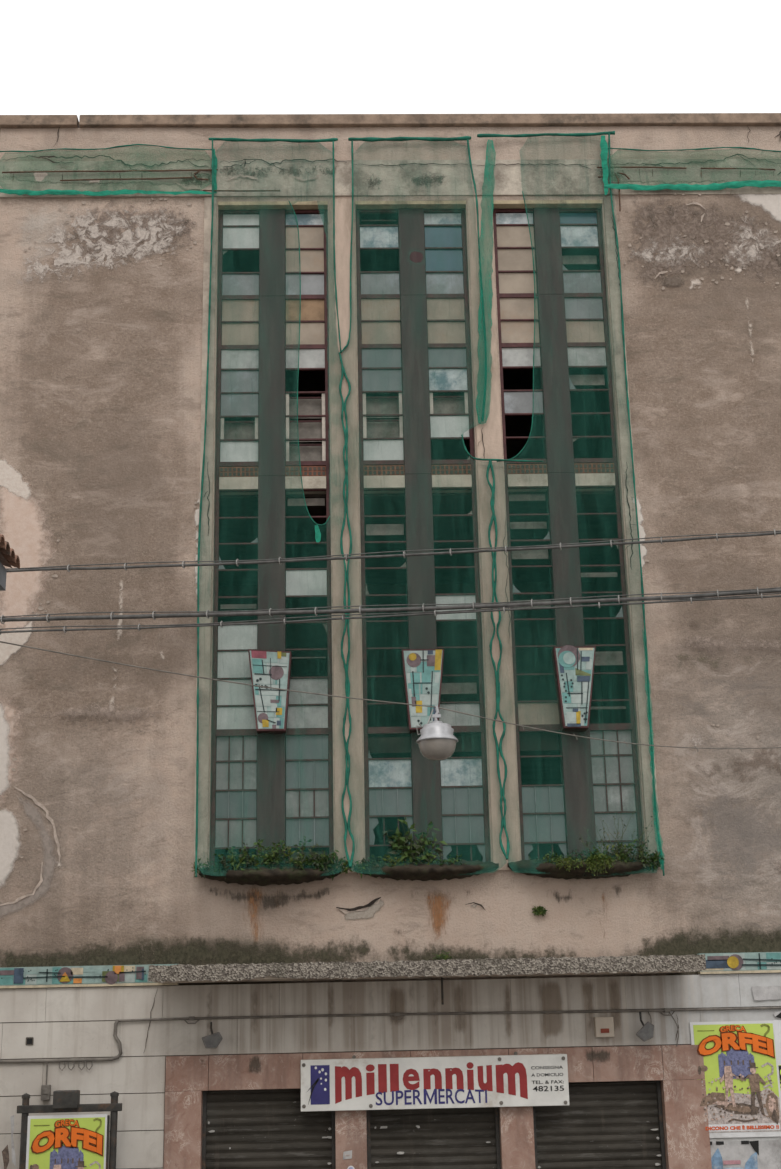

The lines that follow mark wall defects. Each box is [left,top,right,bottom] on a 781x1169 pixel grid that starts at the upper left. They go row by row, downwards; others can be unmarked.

peeling [2,166,336,283]
peeling [597,165,781,290]
water stain [0,786,61,916]
spalling [336,897,384,919]
rust [428,894,450,930]